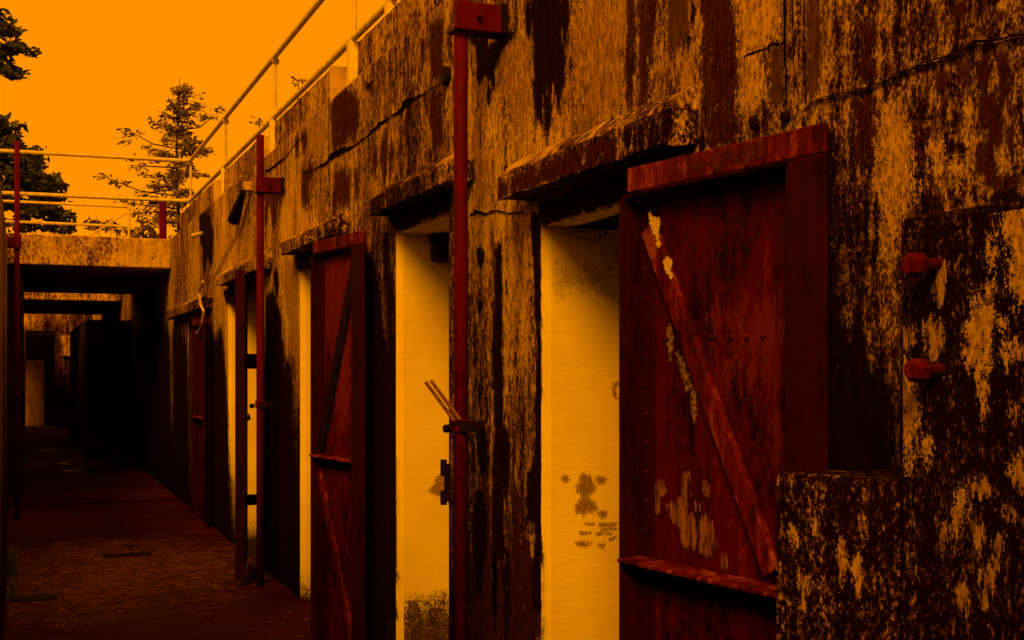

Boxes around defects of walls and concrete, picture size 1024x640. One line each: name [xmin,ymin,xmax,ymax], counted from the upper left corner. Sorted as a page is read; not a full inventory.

water stain [329,81,372,153]
crack [265,83,440,175]
water stain [470,0,571,136]
water stain [625,0,740,160]
crack [744,0,1024,115]
crack [469,210,524,218]
water stain [472,173,641,640]
mould [404,590,449,640]